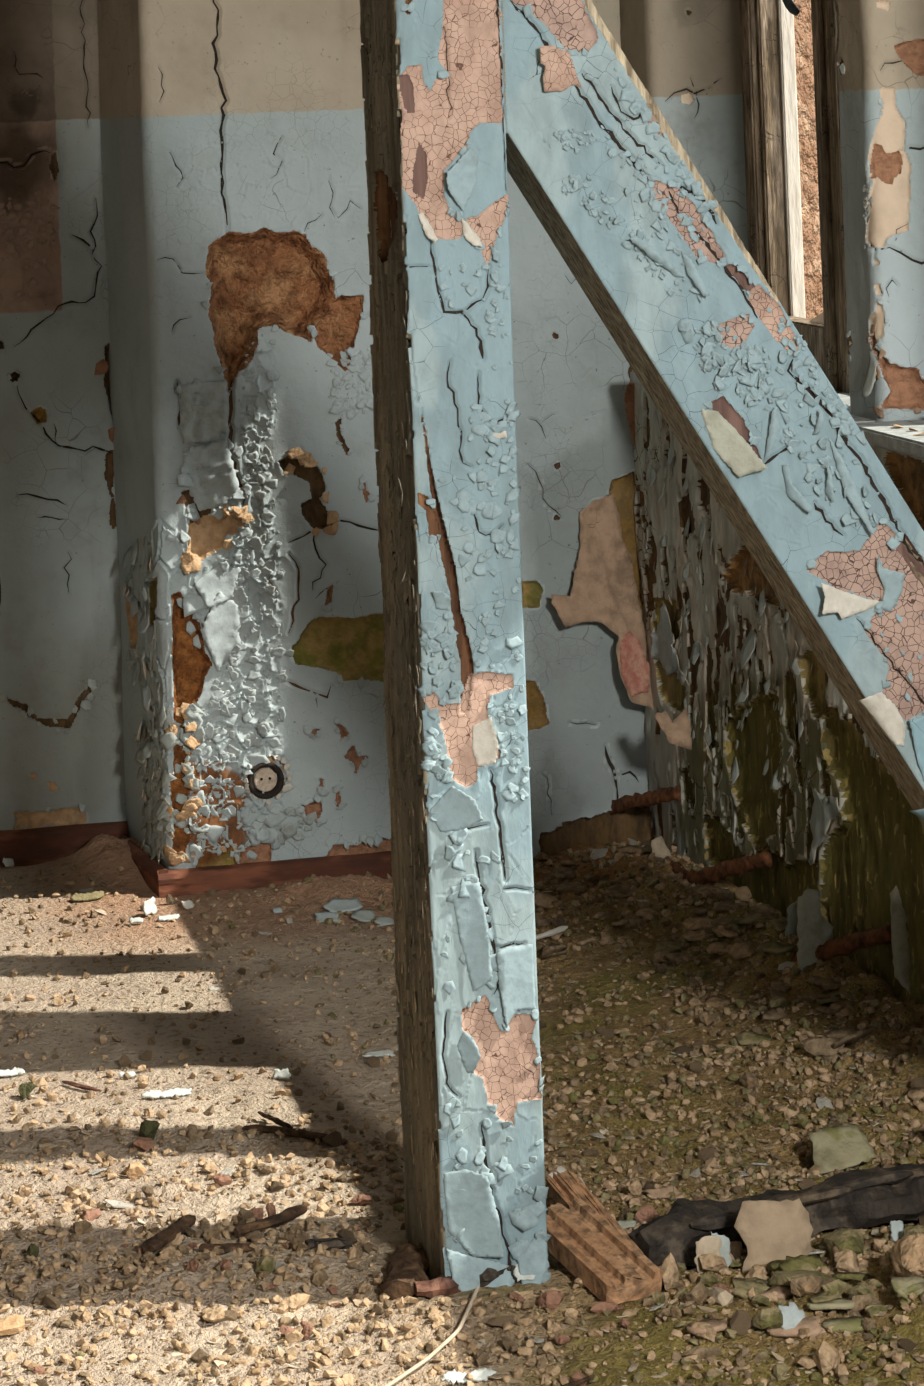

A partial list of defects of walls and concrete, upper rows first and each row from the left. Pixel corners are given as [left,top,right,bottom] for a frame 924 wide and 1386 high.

crack [14,201,102,347]
crack [17,387,113,454]
crack [211,0,228,235]
peeling [395,0,924,721]
crack [574,74,758,318]
spalling [118,228,813,1261]
peeling [720,888,834,1023]
peeling [890,885,911,1004]
peeling [0,1050,134,1238]
peeling [1,1113,397,1385]
crack [427,1012,458,1096]
crack [481,1125,511,1265]